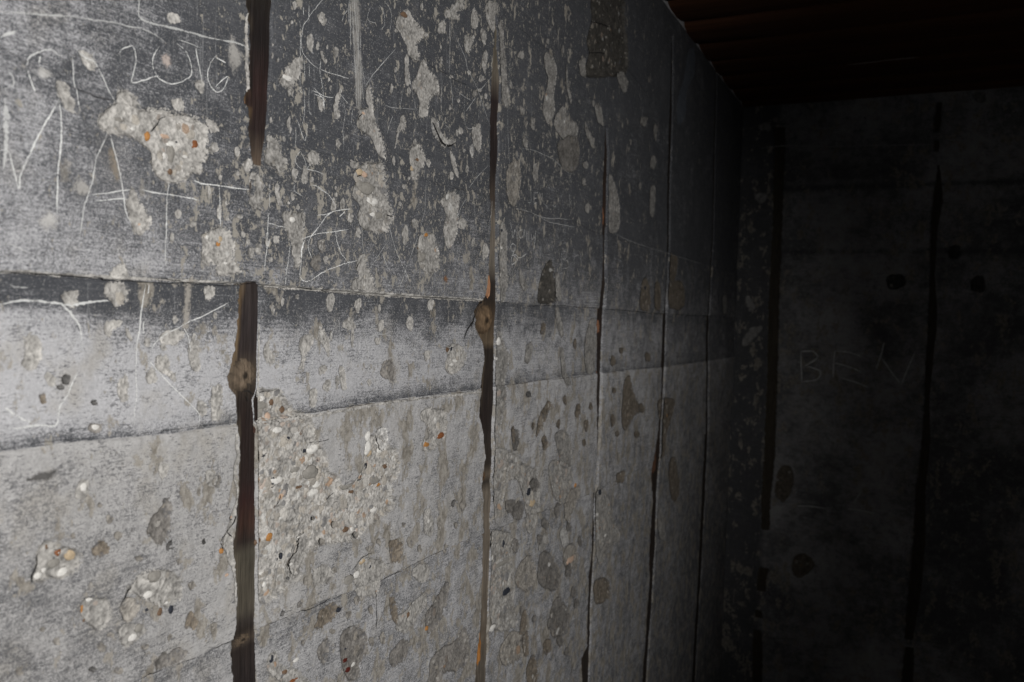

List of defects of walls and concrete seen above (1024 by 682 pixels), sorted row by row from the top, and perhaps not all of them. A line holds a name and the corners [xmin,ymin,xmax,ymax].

spalling [96,86,219,185]
spalling [0,116,320,342]
spalling [331,84,509,304]
spalling [31,479,123,586]
spalling [253,324,482,624]